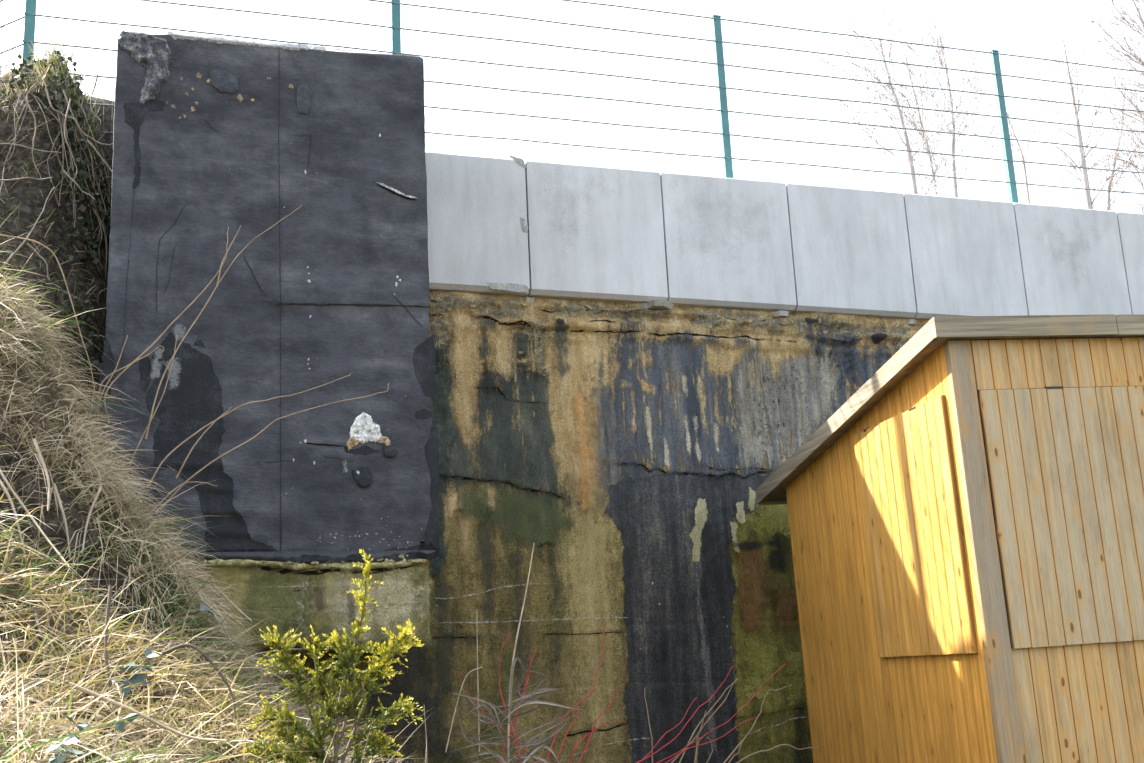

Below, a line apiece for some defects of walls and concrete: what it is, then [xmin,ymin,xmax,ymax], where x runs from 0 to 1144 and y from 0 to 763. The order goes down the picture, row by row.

peeling [124,31,352,190]
crack [244,257,864,343]
crack [448,476,564,499]
water stain [474,304,909,756]
crack [619,463,767,478]